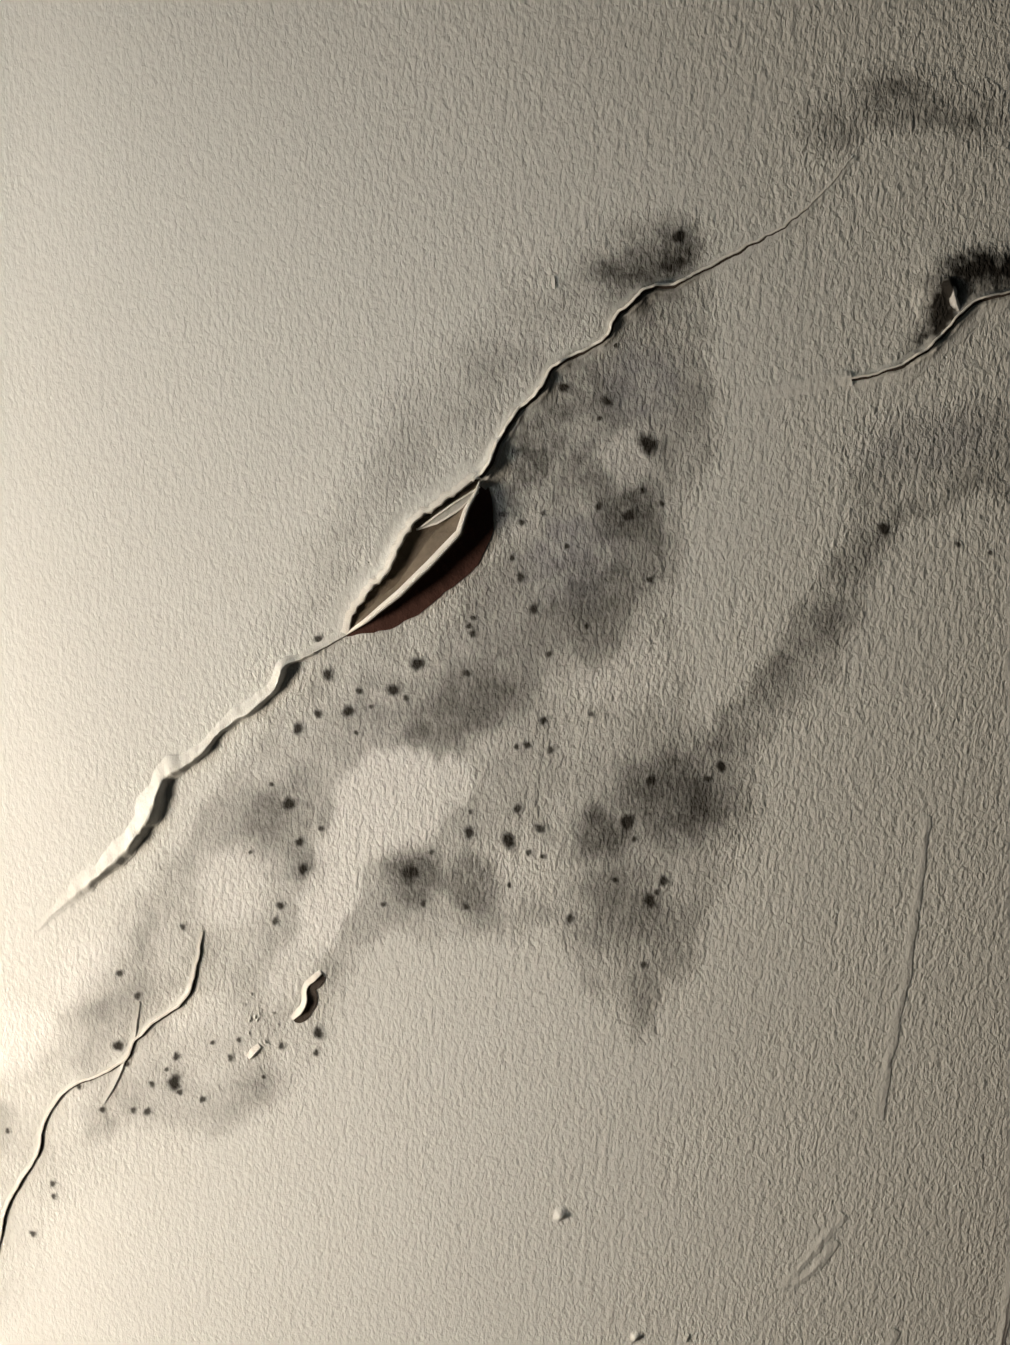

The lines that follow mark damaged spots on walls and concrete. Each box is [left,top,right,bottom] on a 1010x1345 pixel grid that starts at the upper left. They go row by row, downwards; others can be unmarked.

peeling [325,459,494,637]
water stain [245,202,719,688]
crack [472,154,856,491]
crack [748,277,1010,402]
water stain [897,241,1010,360]
crack [34,630,346,932]
water stain [0,277,1010,1334]
crack [0,931,203,1243]